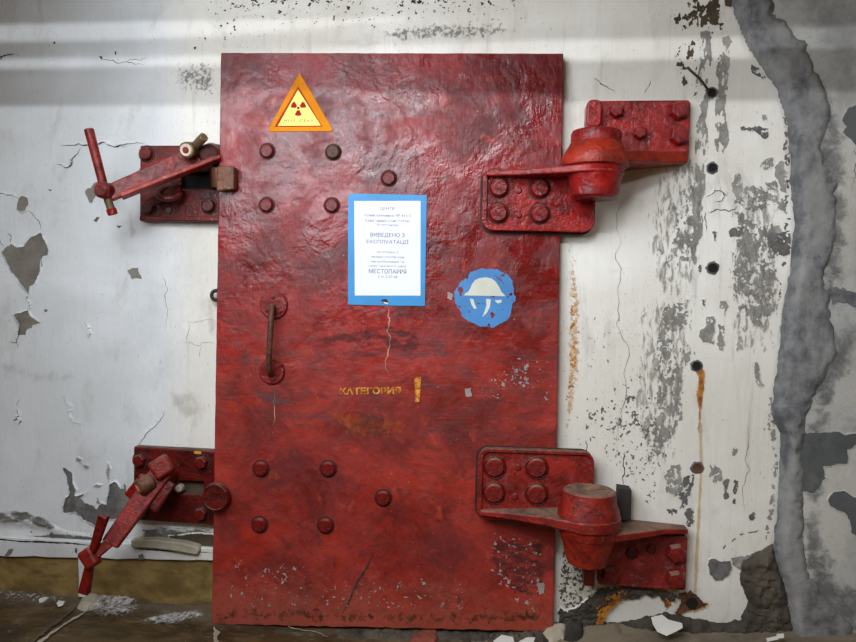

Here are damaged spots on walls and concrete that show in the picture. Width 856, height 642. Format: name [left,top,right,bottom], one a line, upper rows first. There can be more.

crack [57,138,144,168]
peeling [636,0,792,457]
peeling [0,229,51,338]
rust [566,284,580,400]
rust [696,369,705,462]
peeling [60,456,130,528]
spalling [168,531,213,547]
rust [597,598,623,625]
spalling [556,585,708,636]
peeling [664,461,738,527]
peeling [798,430,856,537]
leakage [807,523,856,624]